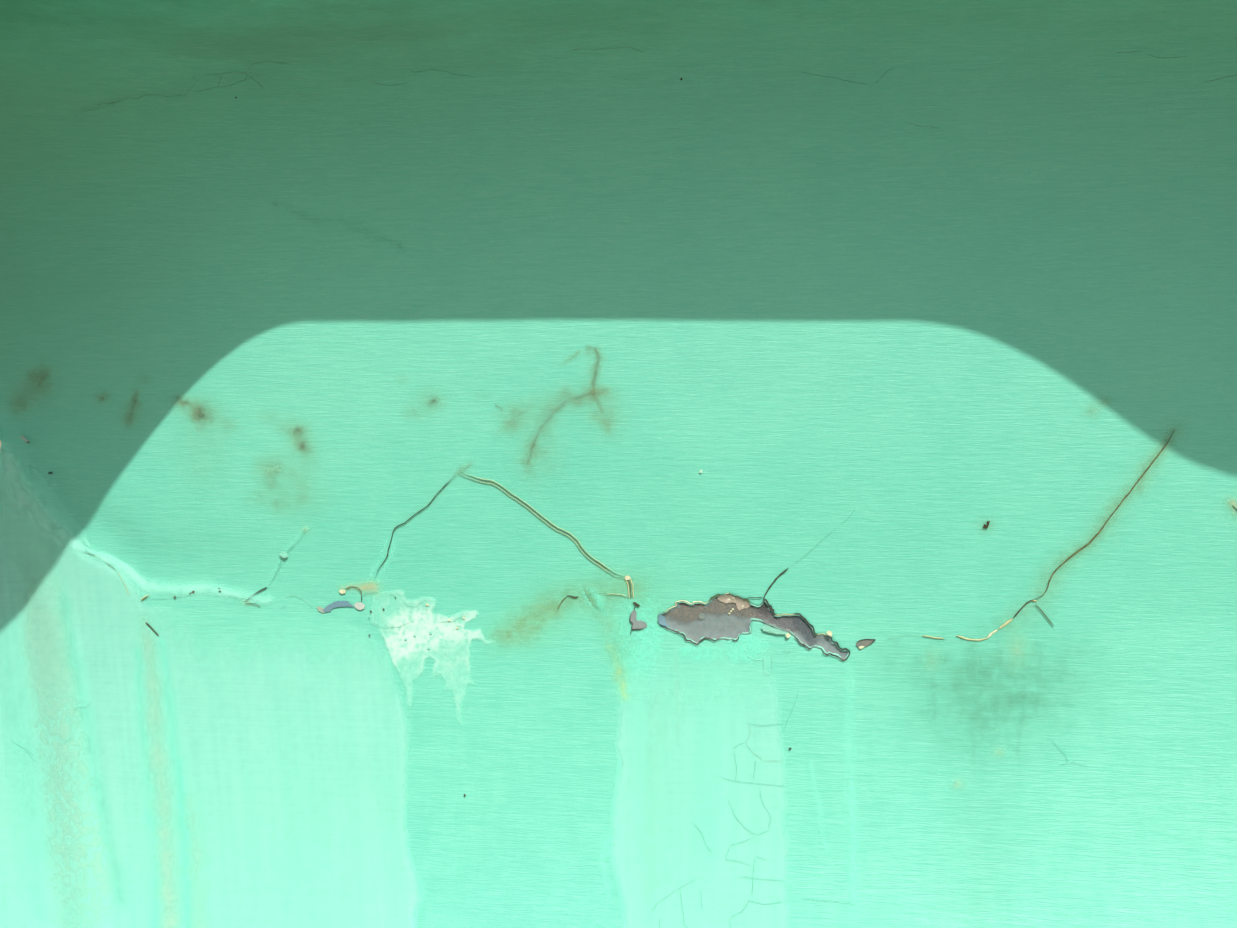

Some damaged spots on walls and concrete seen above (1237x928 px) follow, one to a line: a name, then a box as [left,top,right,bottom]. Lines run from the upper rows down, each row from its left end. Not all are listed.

crack [12,505,267,636]
leakage [0,451,418,928]
crack [346,475,634,608]
peeling [629,593,876,661]
crack [749,568,788,599]
crack [923,430,1175,641]
leakage [613,690,787,928]